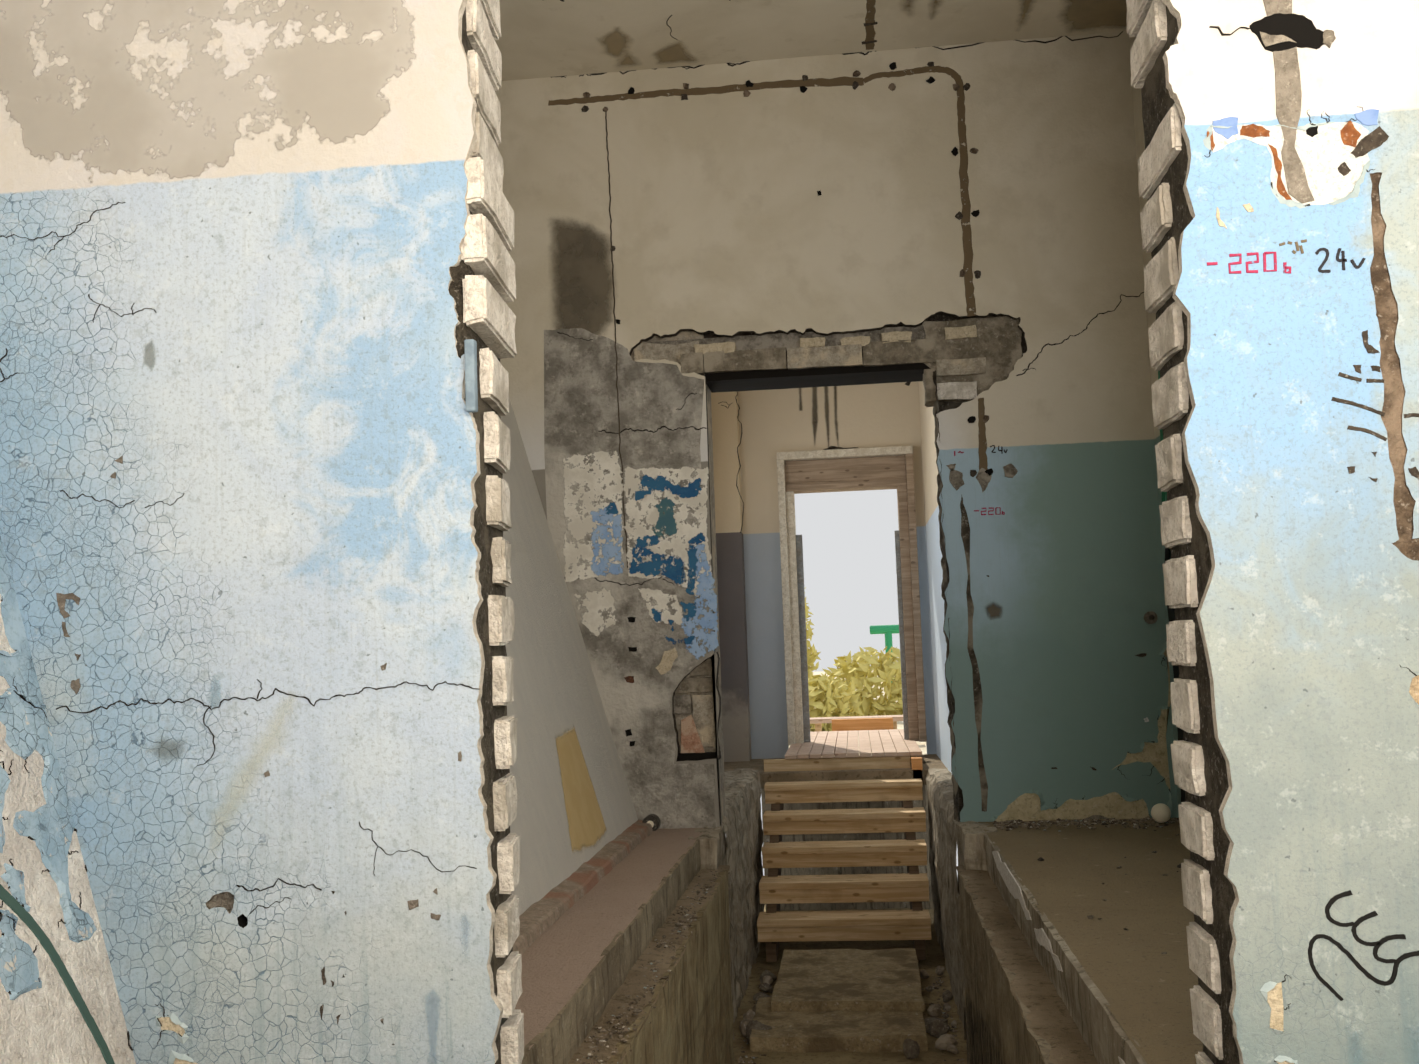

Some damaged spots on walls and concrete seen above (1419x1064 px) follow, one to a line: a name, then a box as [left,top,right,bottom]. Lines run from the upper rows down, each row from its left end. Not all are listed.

peeling [0,0,416,182]
water stain [602,31,635,65]
water stain [657,44,693,62]
water stain [1064,0,1127,30]
crack [0,202,125,252]
crack [88,294,156,323]
crack [60,490,184,508]
spalling [449,0,524,1064]
spalling [989,0,1389,1064]
flaking render [544,328,717,829]
crack [56,679,480,766]
peeling [0,535,97,1000]